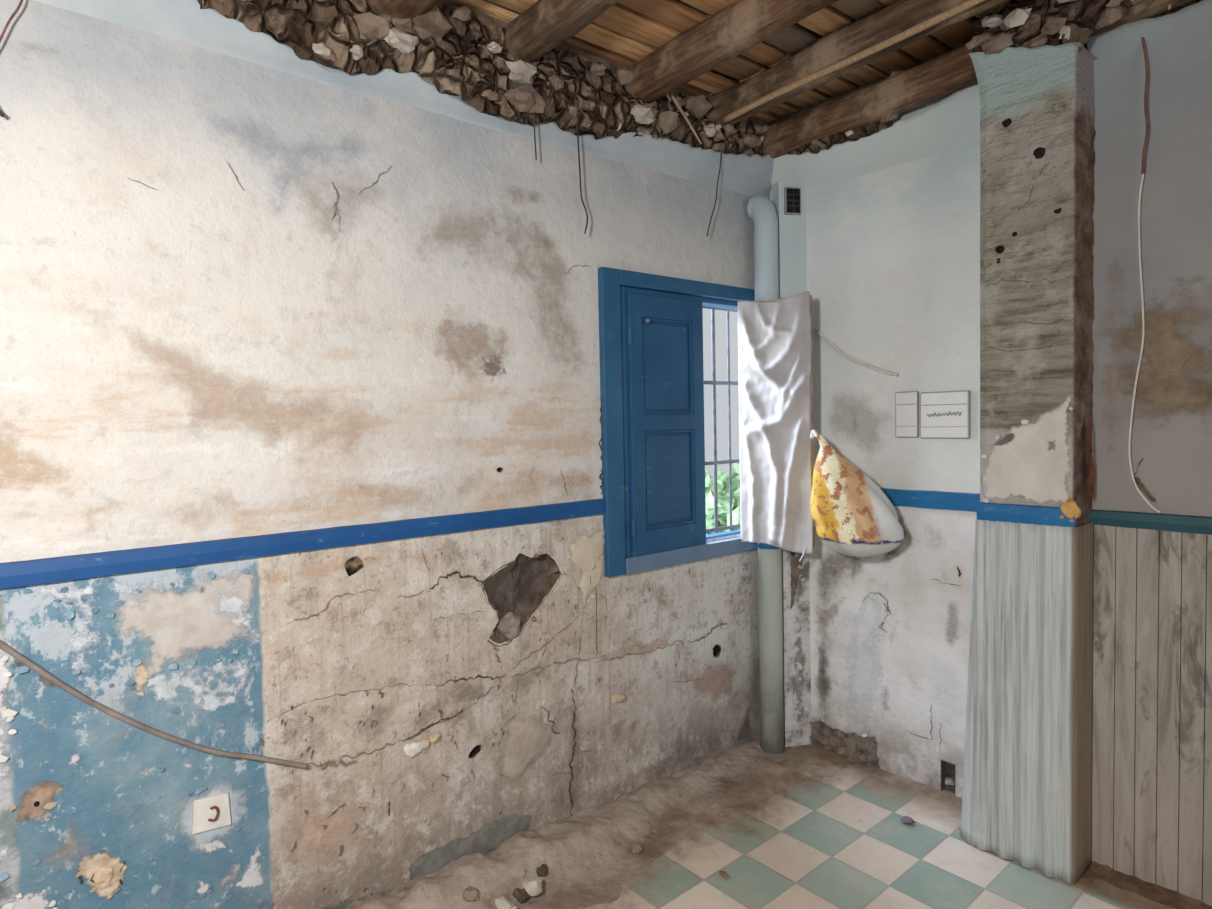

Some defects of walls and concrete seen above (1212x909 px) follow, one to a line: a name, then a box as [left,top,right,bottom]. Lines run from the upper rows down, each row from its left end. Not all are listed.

flaking render [198,0,777,157]
flaking render [784,114,899,155]
flaking render [965,0,1202,55]
leakage [158,351,323,434]
leakage [440,321,505,376]
leakage [1107,306,1212,418]
flaking render [981,396,1082,522]
peeling [23,569,260,716]
crack [266,587,728,816]
spalling [398,530,605,663]
flaking render [793,637,880,768]
peeling [31,835,127,899]